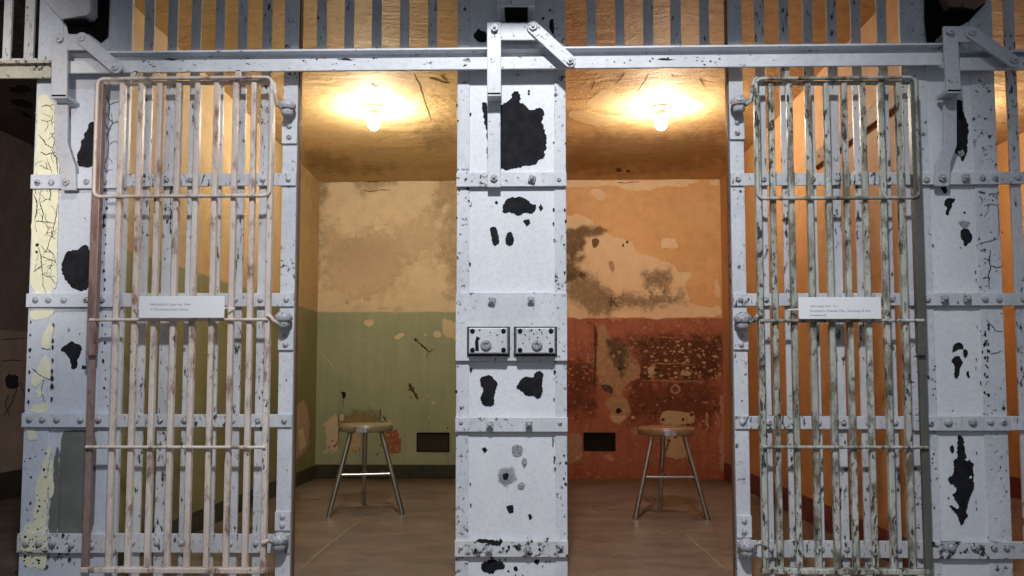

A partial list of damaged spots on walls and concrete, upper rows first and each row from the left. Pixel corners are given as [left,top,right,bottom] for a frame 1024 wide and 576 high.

crack [414,75,448,123]
peeling [457,102,488,159]
peeling [501,90,566,170]
peeling [61,189,108,291]
water stain [566,226,614,315]
crack [979,191,1004,290]
crack [0,94,77,569]
peeling [495,197,730,490]
peeling [296,400,310,459]
peeling [322,414,361,454]
peeling [376,429,402,455]
peeling [948,435,977,526]